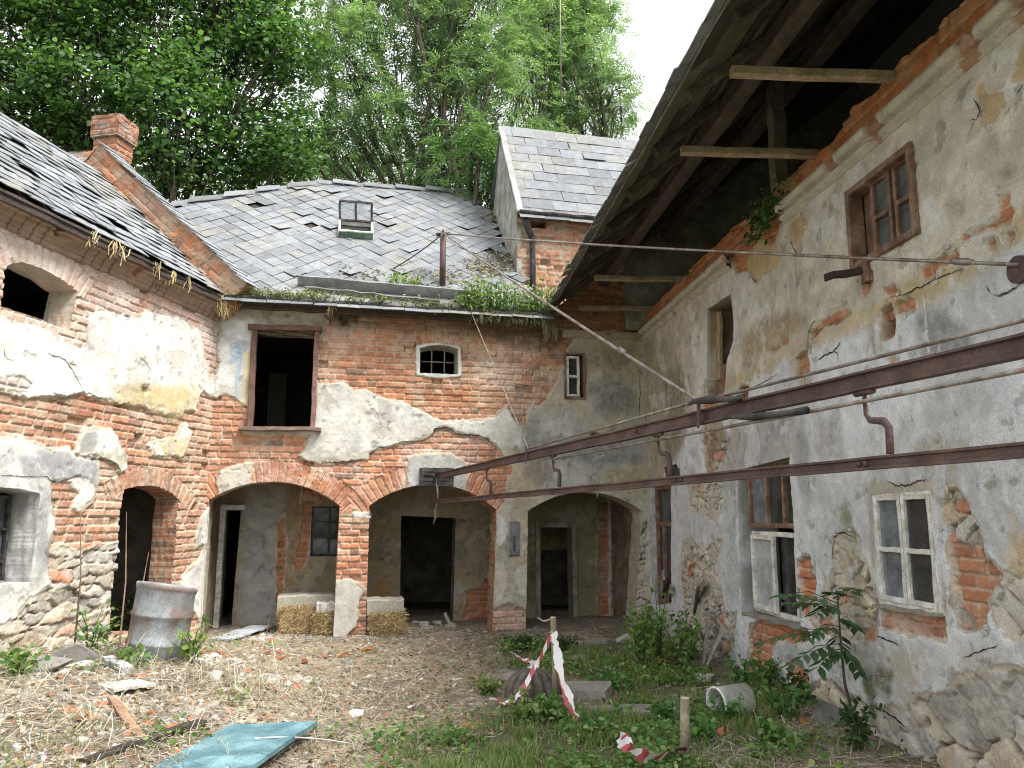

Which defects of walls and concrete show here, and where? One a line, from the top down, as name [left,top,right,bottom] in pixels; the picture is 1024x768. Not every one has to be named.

peeling [968,38,1024,155]
spalling [646,0,1000,322]
crack [804,321,841,381]
spalling [854,264,921,365]
crack [895,269,961,297]
spalling [979,217,1024,262]
crack [986,284,1019,297]
spalling [0,228,638,651]
spalling [679,421,1024,768]